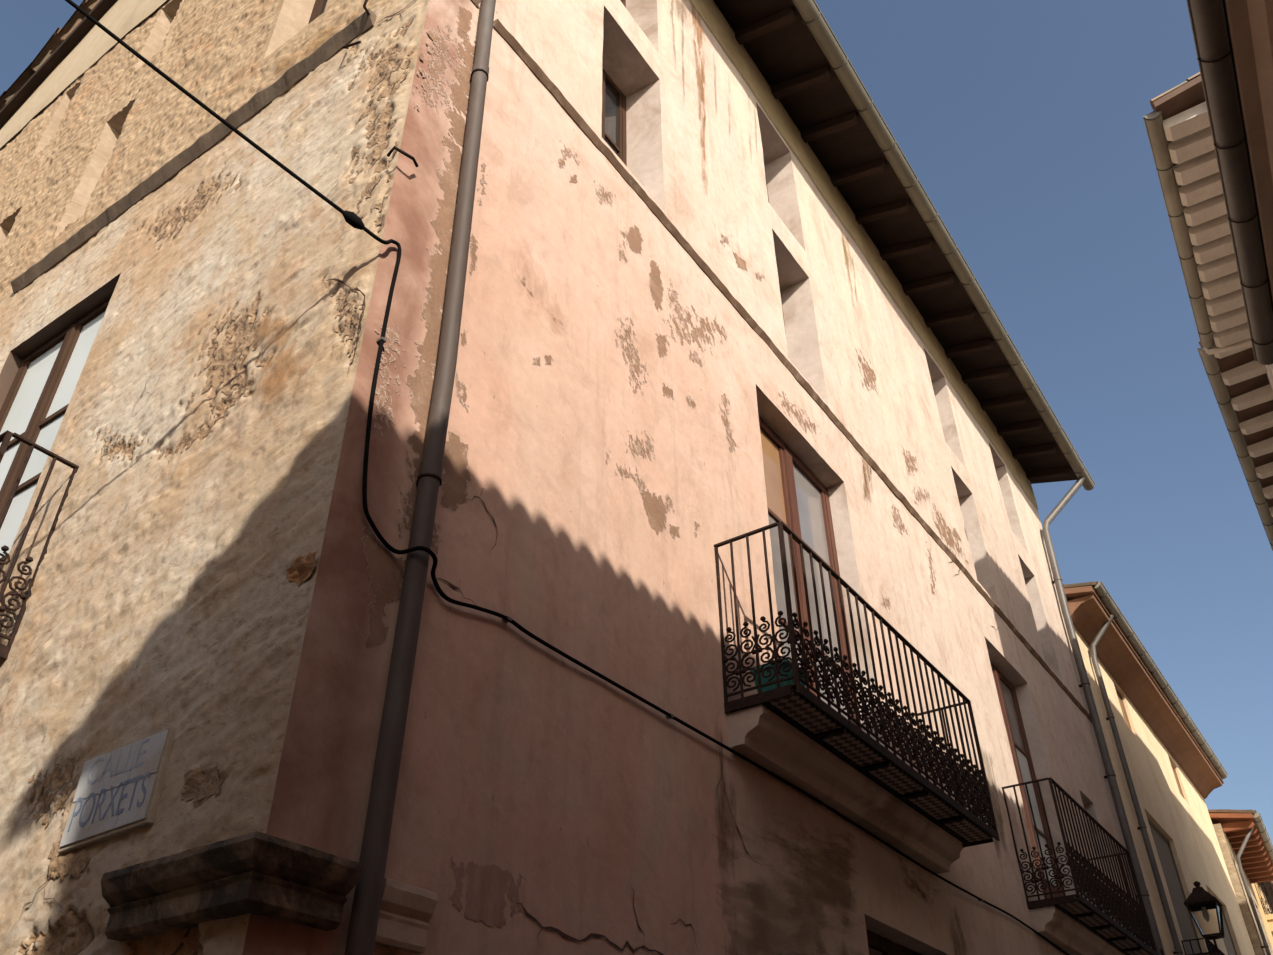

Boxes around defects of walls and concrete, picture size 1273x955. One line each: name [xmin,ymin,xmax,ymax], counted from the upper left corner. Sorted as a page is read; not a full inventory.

peeling [593,179,616,204]
peeling [468,227,478,274]
flaking render [322,276,364,362]
peeling [346,5,476,647]
peeling [615,317,647,395]
peeling [619,225,727,367]
peeling [662,383,696,408]
peeling [719,393,738,452]
crack [467,488,498,551]
peeling [605,430,680,539]
crack [517,880,664,955]